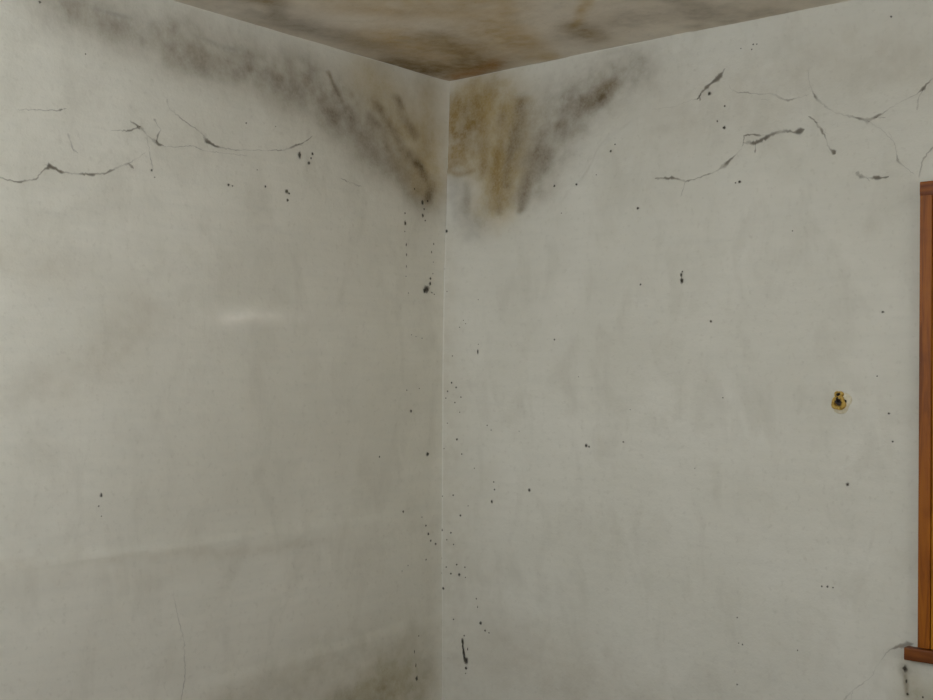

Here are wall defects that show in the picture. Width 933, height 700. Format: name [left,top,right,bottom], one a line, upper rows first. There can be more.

leakage [6,0,849,249]
leakage [177,601,442,700]
leakage [885,640,933,700]